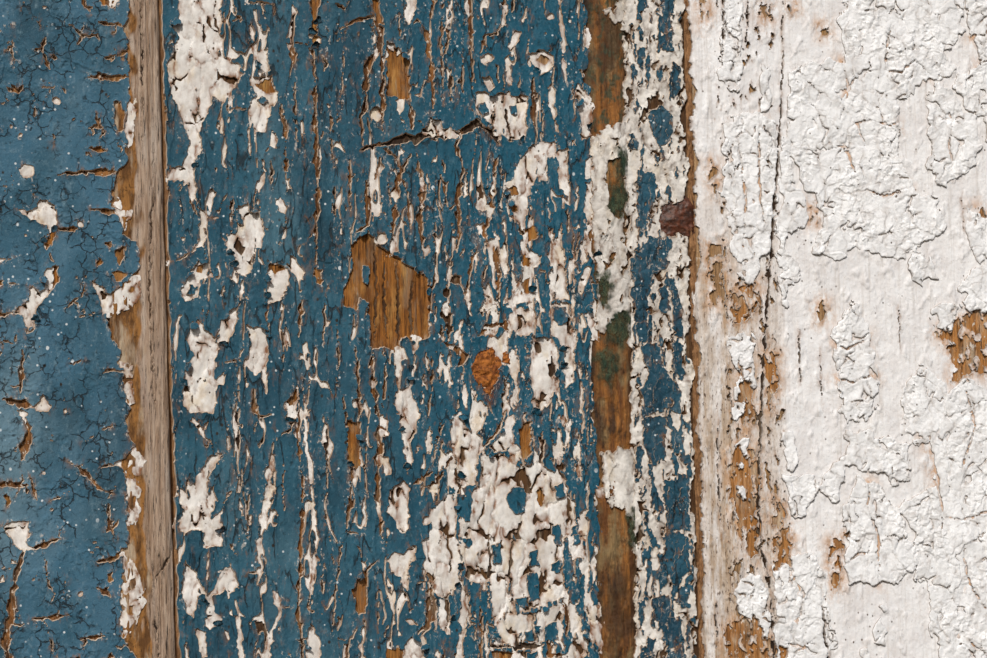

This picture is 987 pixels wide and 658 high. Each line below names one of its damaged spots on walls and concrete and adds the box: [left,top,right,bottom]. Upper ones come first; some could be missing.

crack [1,539,62,658]
crack [75,0,144,106]
peeling [172,438,236,554]
peeling [162,0,278,301]
peeling [179,263,289,442]
crack [361,342,391,537]
crack [270,0,576,439]
corrosion [471,347,510,405]
peeling [342,28,686,658]
crack [755,2,783,658]
peeling [706,0,987,425]
peeling [724,207,987,658]